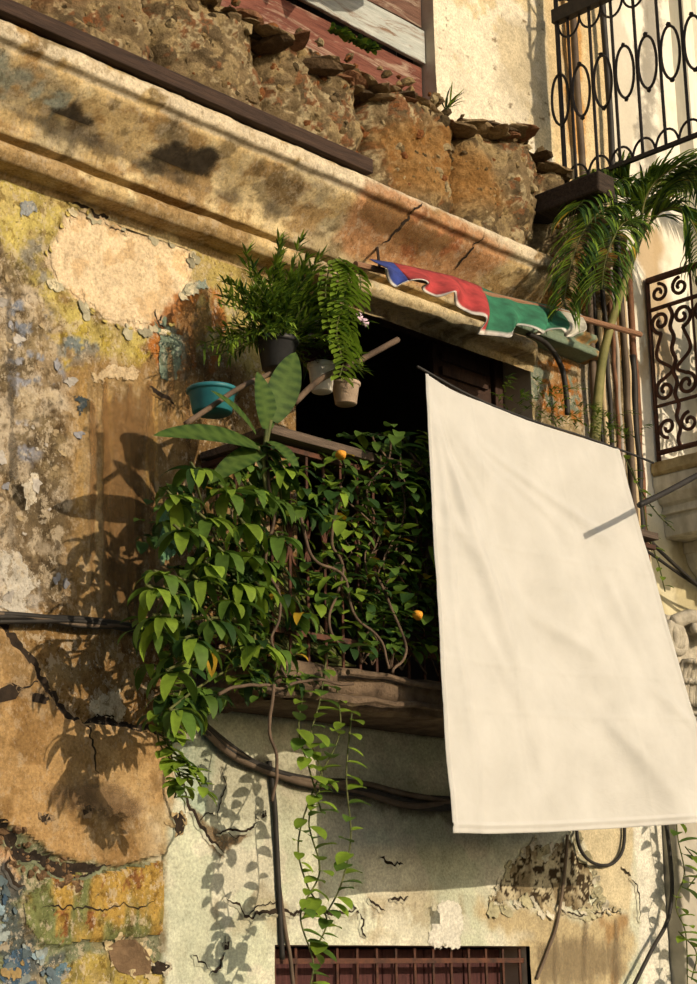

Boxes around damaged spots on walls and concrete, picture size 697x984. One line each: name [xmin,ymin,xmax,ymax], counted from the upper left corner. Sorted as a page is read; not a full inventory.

spalling [13,0,580,295]
crack [382,203,423,244]
spalling [0,207,209,613]
crack [0,624,163,779]
crack [173,767,259,857]
peeling [0,875,72,984]
crack [0,819,162,912]
peeling [104,932,173,980]
crack [221,896,409,939]
crack [378,856,404,869]
spalling [486,831,622,923]